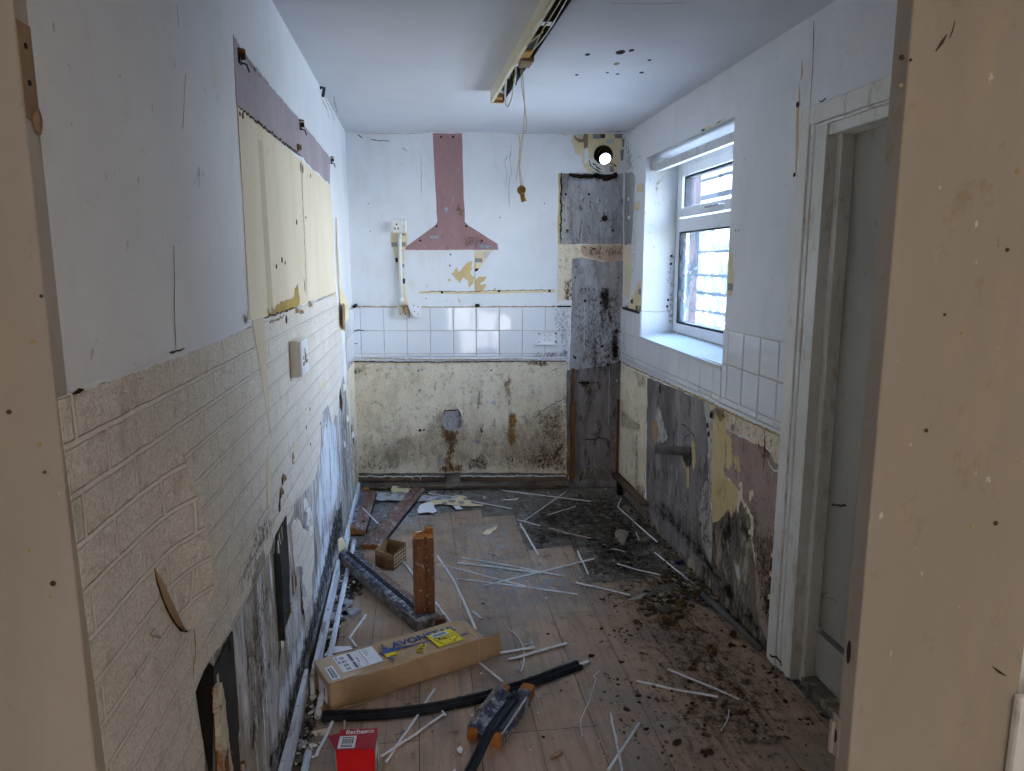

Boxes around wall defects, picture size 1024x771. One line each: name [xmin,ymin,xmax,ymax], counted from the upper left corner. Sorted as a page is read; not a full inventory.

flaking render [233,33,336,324]
flaking render [391,133,498,303]
peeling [564,134,617,172]
flaking render [195,376,361,771]
corrosion [440,425,462,473]
leakage [500,382,567,470]
flaking render [646,378,710,569]
leakage [647,482,767,653]
flaking render [724,429,780,640]